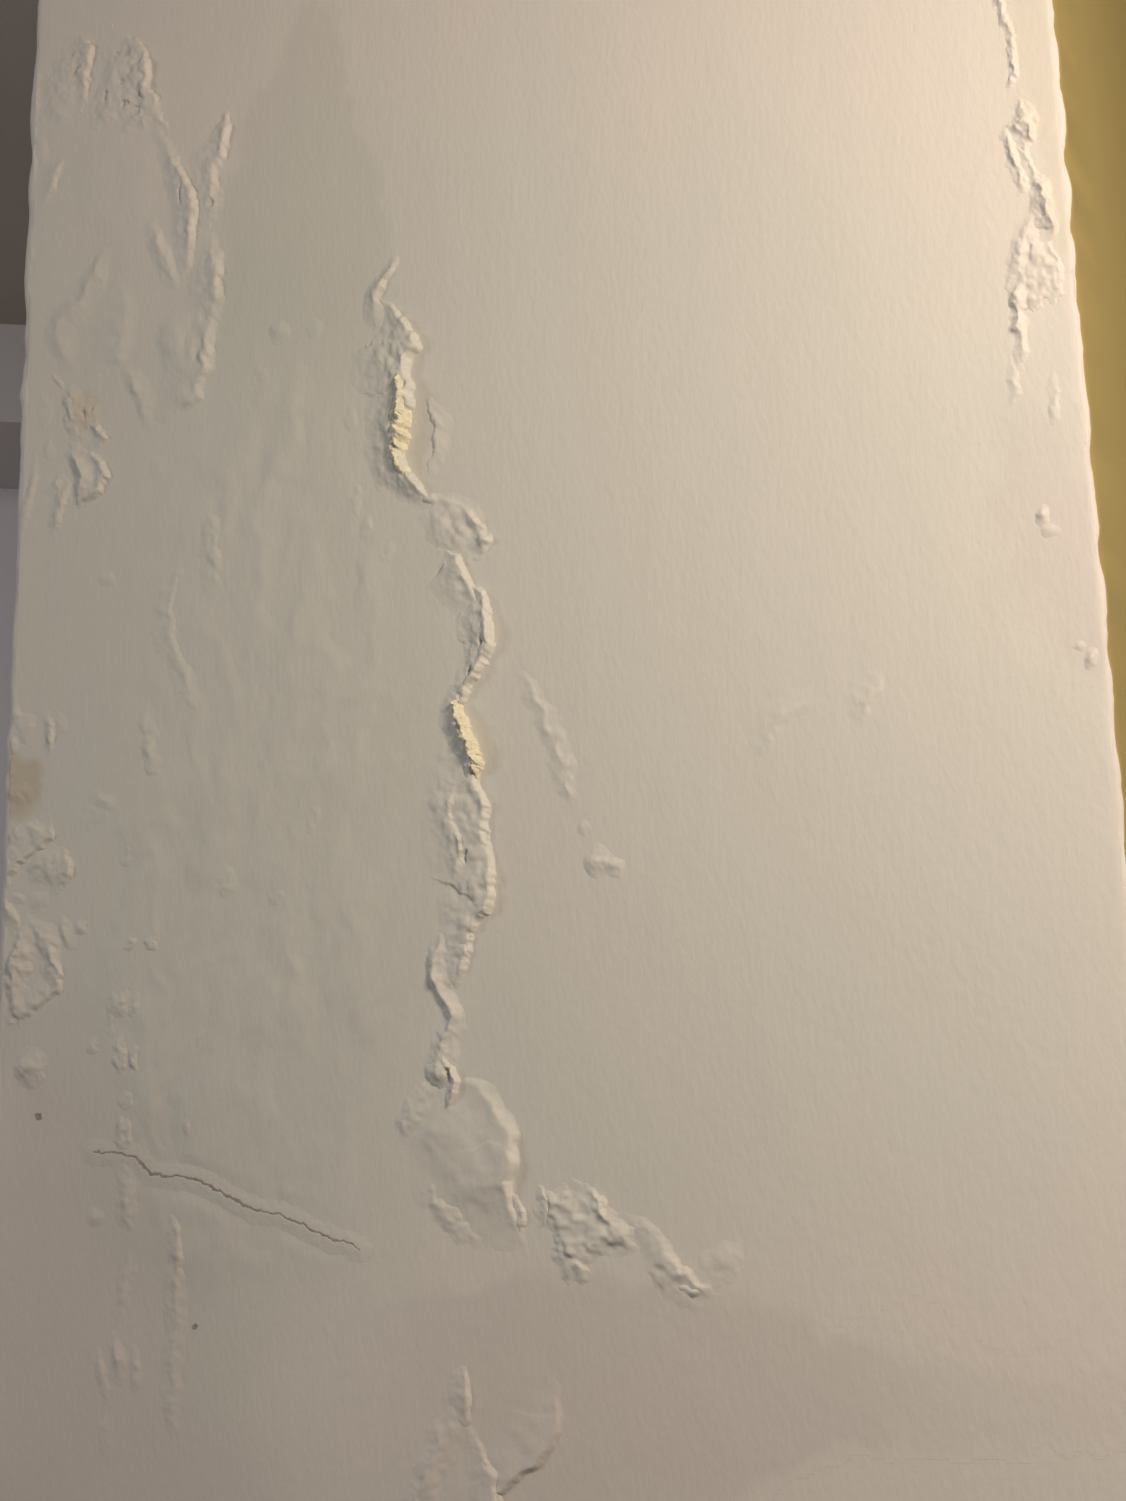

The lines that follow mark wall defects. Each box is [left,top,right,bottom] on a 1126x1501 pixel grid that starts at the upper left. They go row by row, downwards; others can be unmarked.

peeling [992,0,1065,408]
peeling [19,371,111,537]